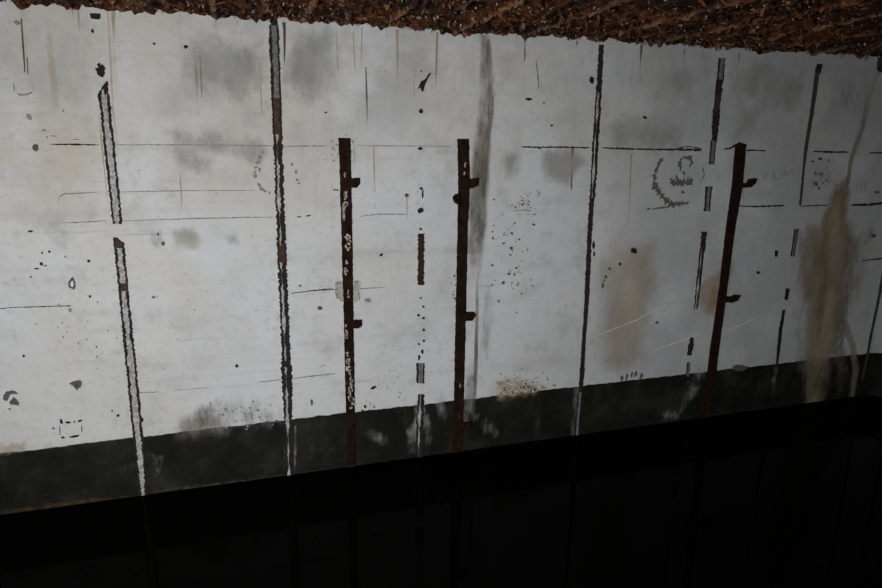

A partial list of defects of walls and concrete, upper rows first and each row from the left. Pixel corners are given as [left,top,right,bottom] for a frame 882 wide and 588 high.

rust [338,138,361,468]
leakage [0,122,882,515]
rust [451,139,478,453]
leakage [470,35,493,255]
rust [701,144,757,418]